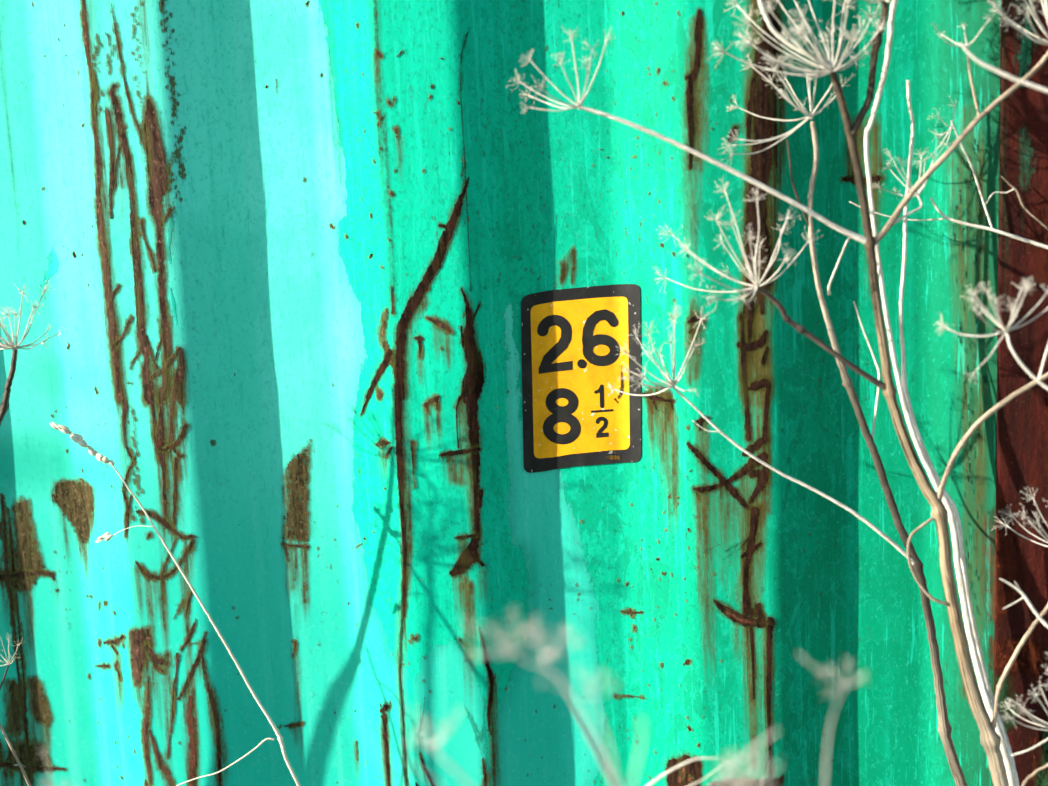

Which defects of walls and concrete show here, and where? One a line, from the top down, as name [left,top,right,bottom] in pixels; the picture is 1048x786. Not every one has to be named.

corrosion [82,32,115,127]
corrosion [159,0,186,212]
corrosion [422,394,440,439]
corrosion [413,315,453,364]
corrosion [641,0,786,638]
corrosion [0,675,67,786]
corrosion [0,493,71,646]
corrosion [51,469,95,564]
corrosion [88,409,196,786]
corrosion [281,439,319,605]
corrosion [377,575,434,786]
corrosion [980,579,1048,733]